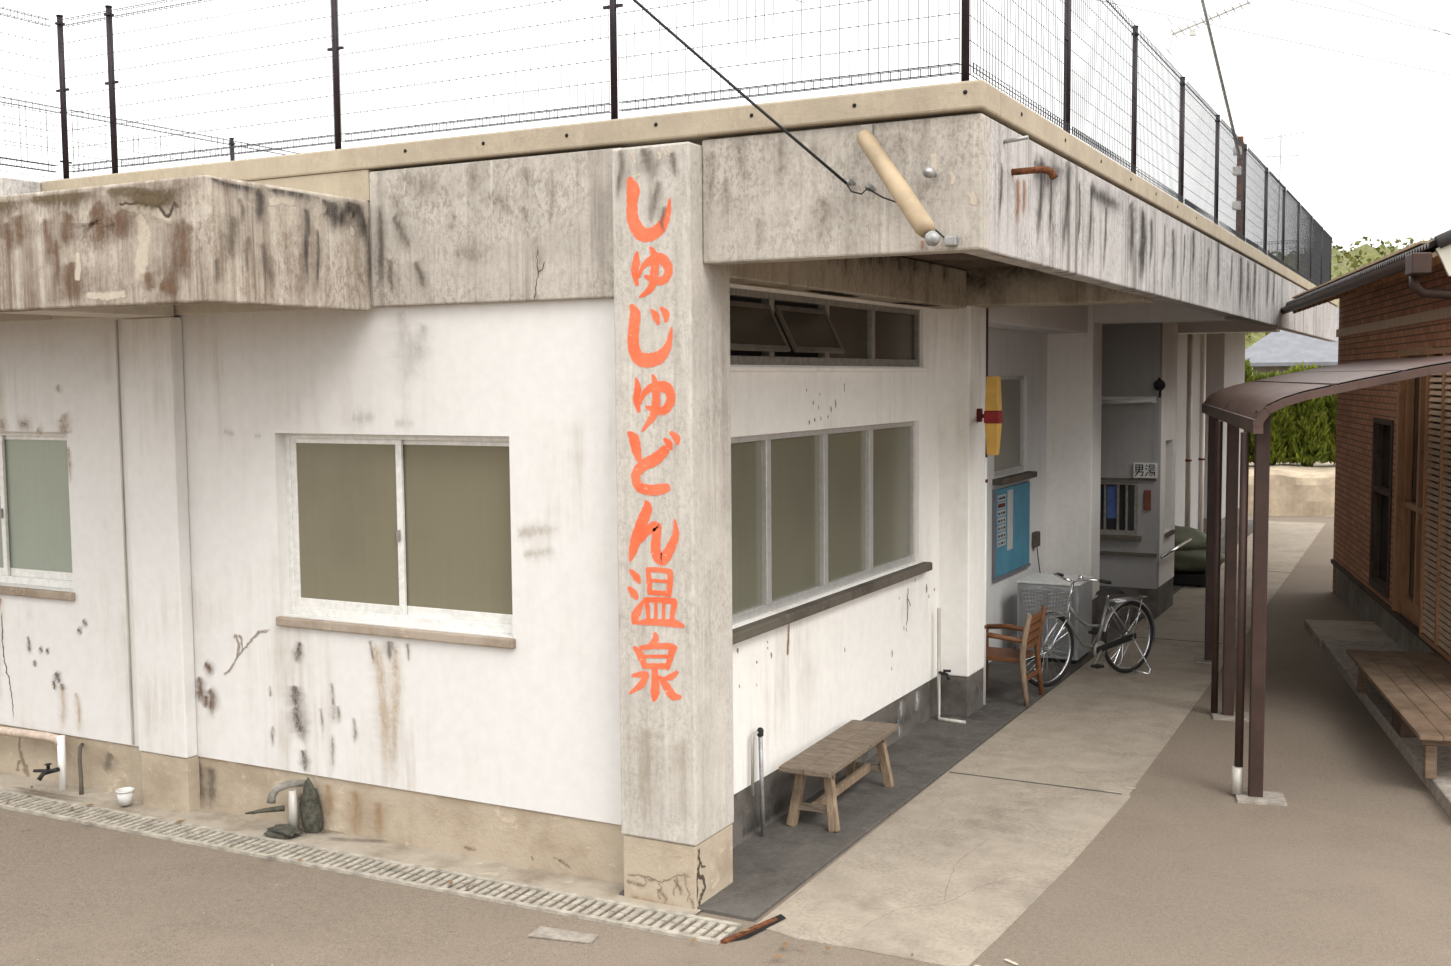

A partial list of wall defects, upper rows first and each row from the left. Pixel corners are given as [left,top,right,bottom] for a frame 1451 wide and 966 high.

water stain [0,187,174,296]
water stain [146,221,188,294]
water stain [213,178,406,284]
water stain [1035,162,1275,300]
crack [629,849,706,906]